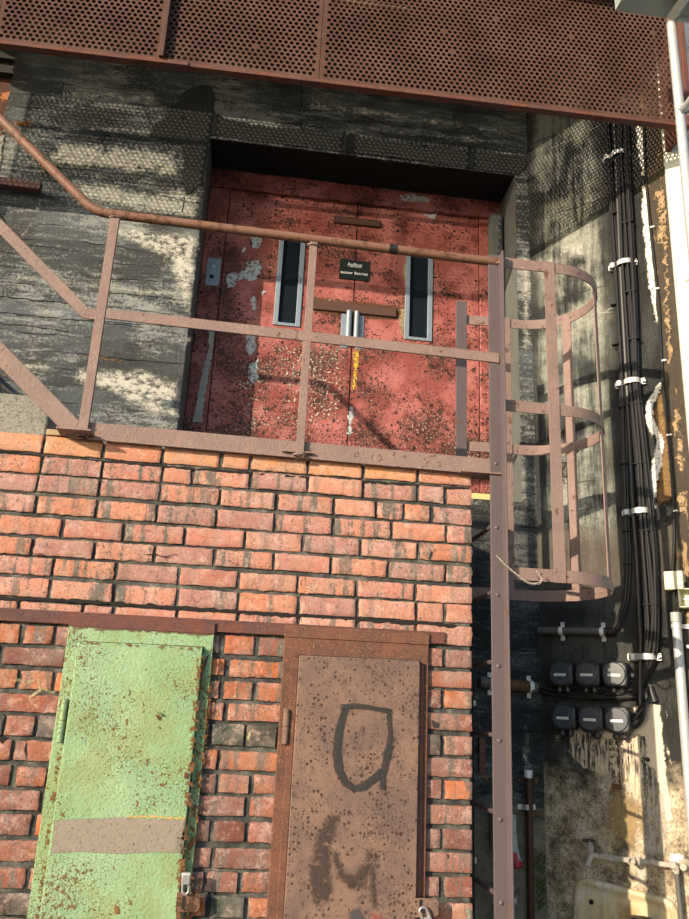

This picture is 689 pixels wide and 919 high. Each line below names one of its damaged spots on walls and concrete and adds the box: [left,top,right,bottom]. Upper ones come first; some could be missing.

peeling [226,237,262,288]
damp [645,382,671,509]
rust [44,748,62,848]
rust [72,626,212,919]
damp [608,788,643,844]